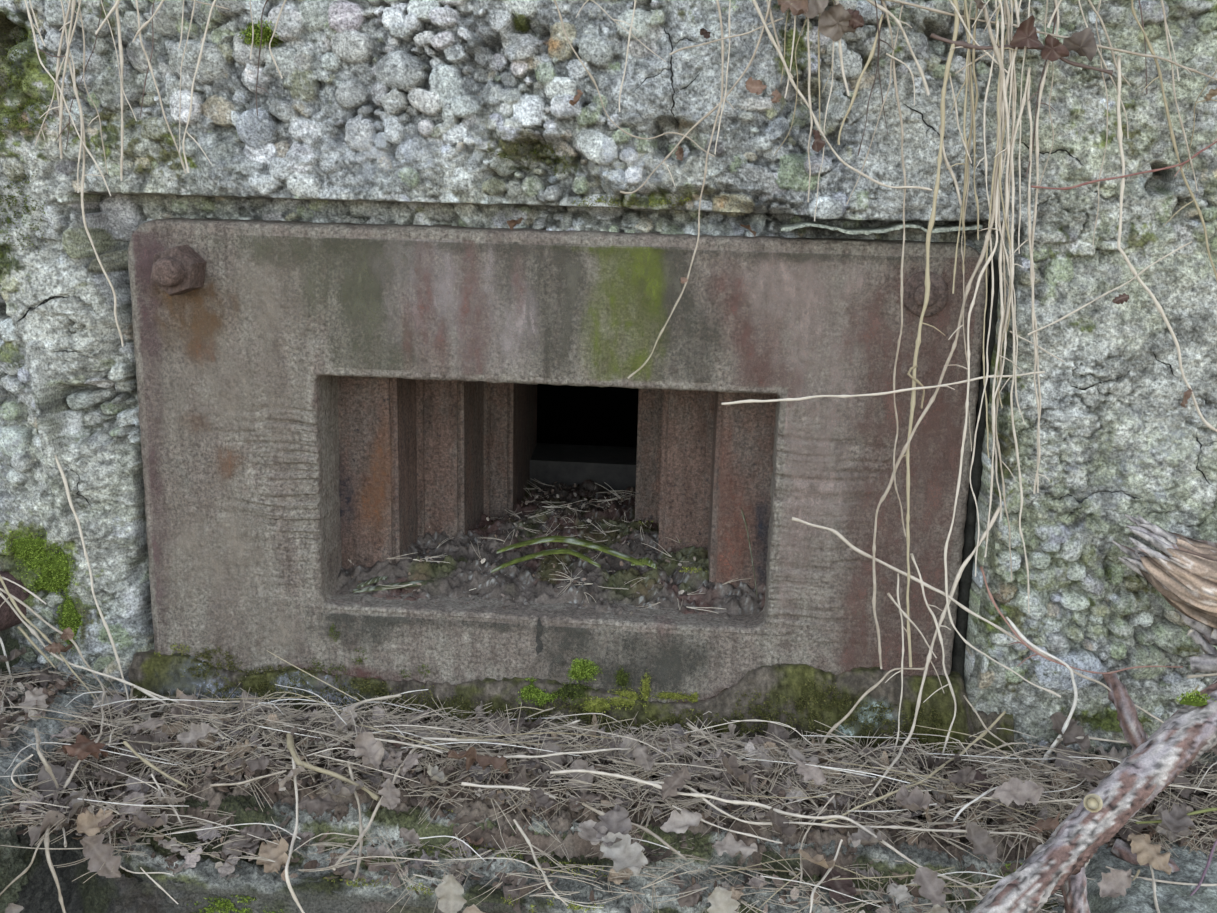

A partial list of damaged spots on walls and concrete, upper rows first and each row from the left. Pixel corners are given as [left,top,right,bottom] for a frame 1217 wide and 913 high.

crack [634,26,701,123]
leakage [233,235,726,383]
rust [840,257,976,677]
rust [353,576,434,593]
rust [491,536,657,573]